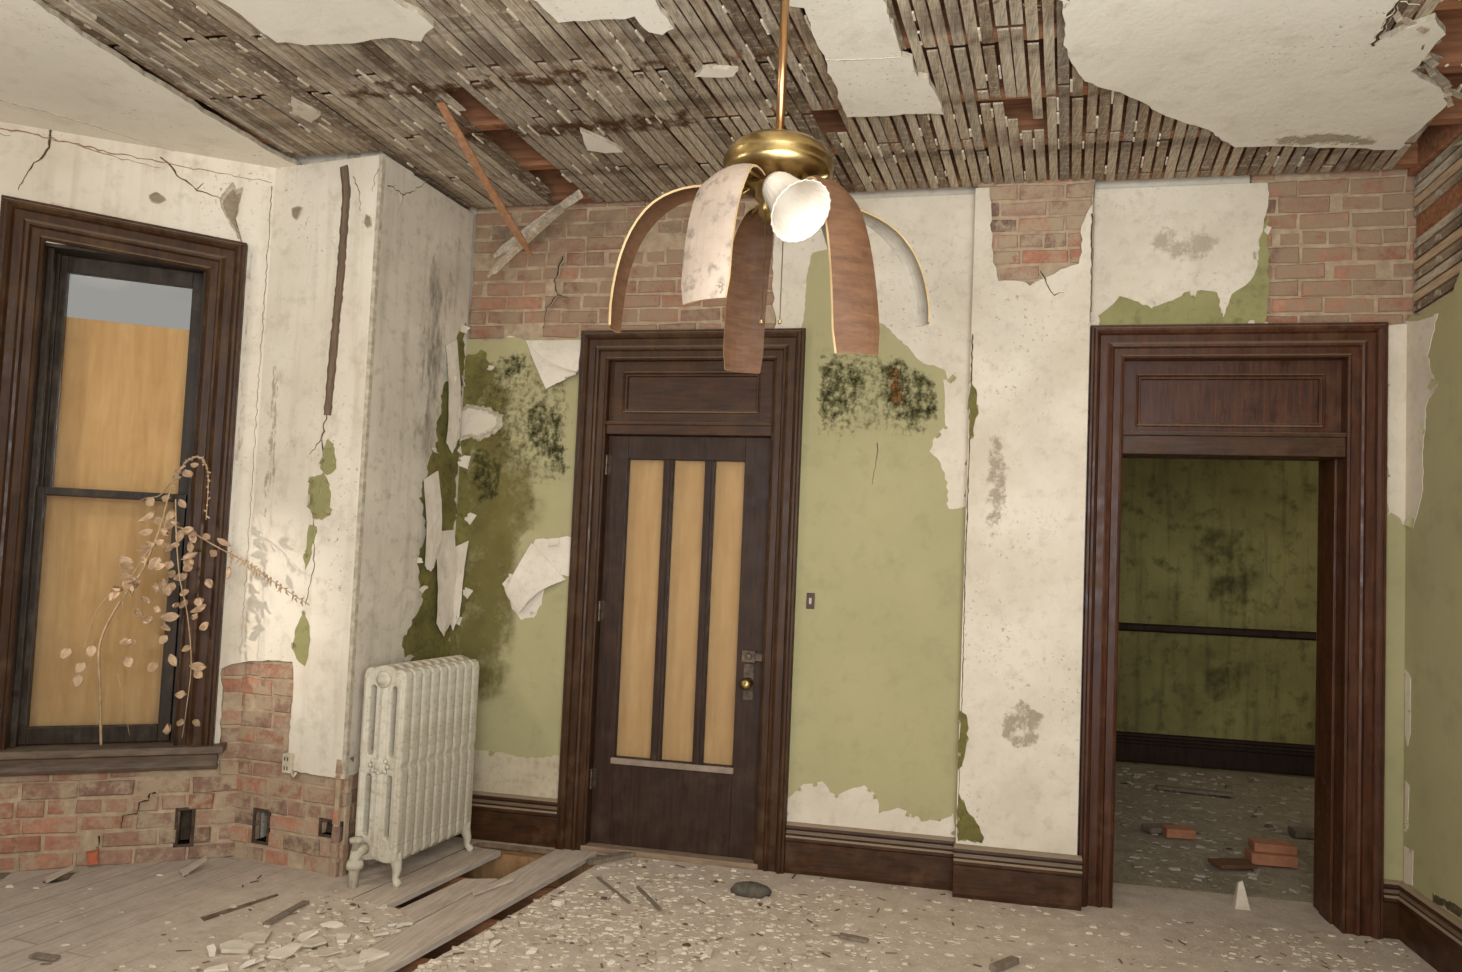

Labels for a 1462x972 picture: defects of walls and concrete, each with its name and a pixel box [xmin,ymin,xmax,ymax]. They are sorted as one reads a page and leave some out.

spalling [219,182,243,242]
flaking render [734,196,759,236]
crack [0,100,272,646]
flaking render [402,200,726,662]
leakage [820,362,868,425]
leakage [879,361,936,430]
flaking render [977,168,1438,529]
peeling [303,439,337,570]
leakage [457,356,565,696]
flaking render [0,611,365,878]
peeling [957,711,969,769]
peeling [787,782,984,843]